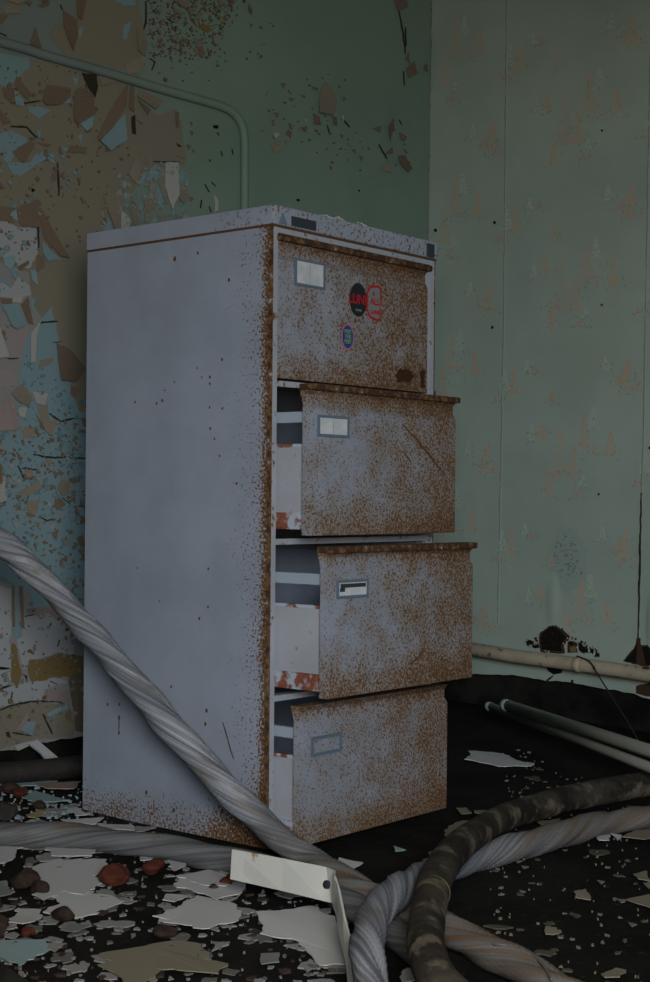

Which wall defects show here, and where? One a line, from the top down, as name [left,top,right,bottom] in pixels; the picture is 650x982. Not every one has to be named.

flaking render [0,0,236,600]
flaking render [0,696,75,751]